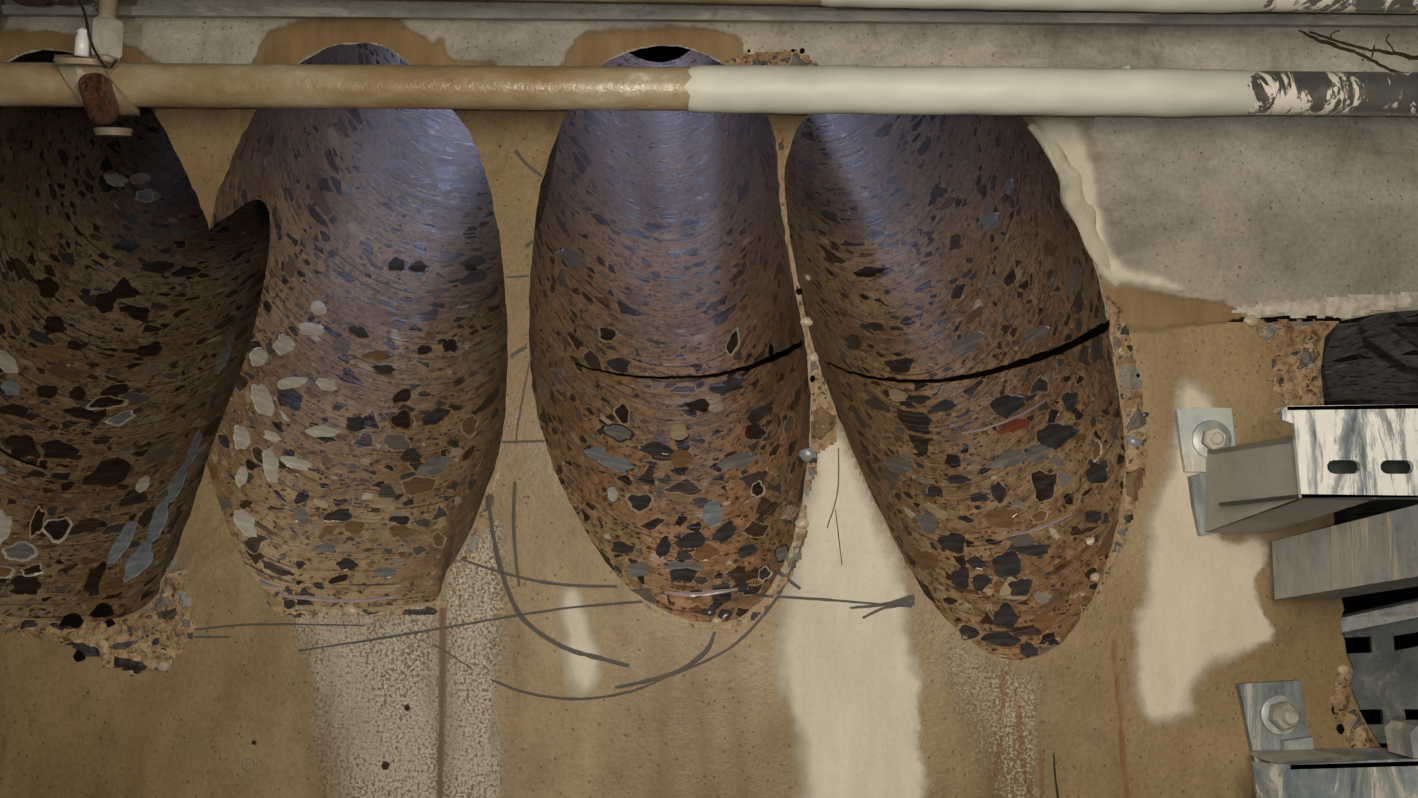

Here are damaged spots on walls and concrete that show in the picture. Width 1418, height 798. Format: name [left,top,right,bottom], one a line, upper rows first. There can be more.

crack [1299,30,1418,72]
crack [1227,315,1341,323]
crack [575,320,1110,383]
water stain [1176,381,1213,410]
water stain [1134,431,1274,722]
water stain [778,432,927,798]
water stain [296,522,501,798]